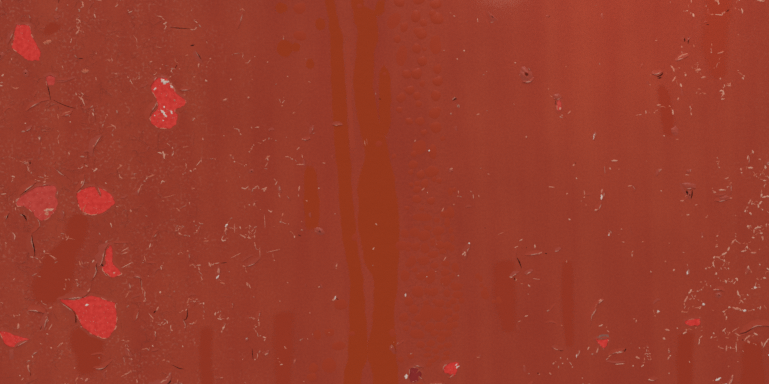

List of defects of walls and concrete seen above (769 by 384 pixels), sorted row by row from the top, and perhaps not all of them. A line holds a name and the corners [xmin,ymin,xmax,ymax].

spalling [6,22,52,63]
spalling [148,74,191,131]
spalling [15,180,61,224]
spalling [74,168,118,218]
spalling [57,283,120,341]
spalling [0,324,33,351]
spalling [404,365,424,384]
spalling [432,360,461,384]